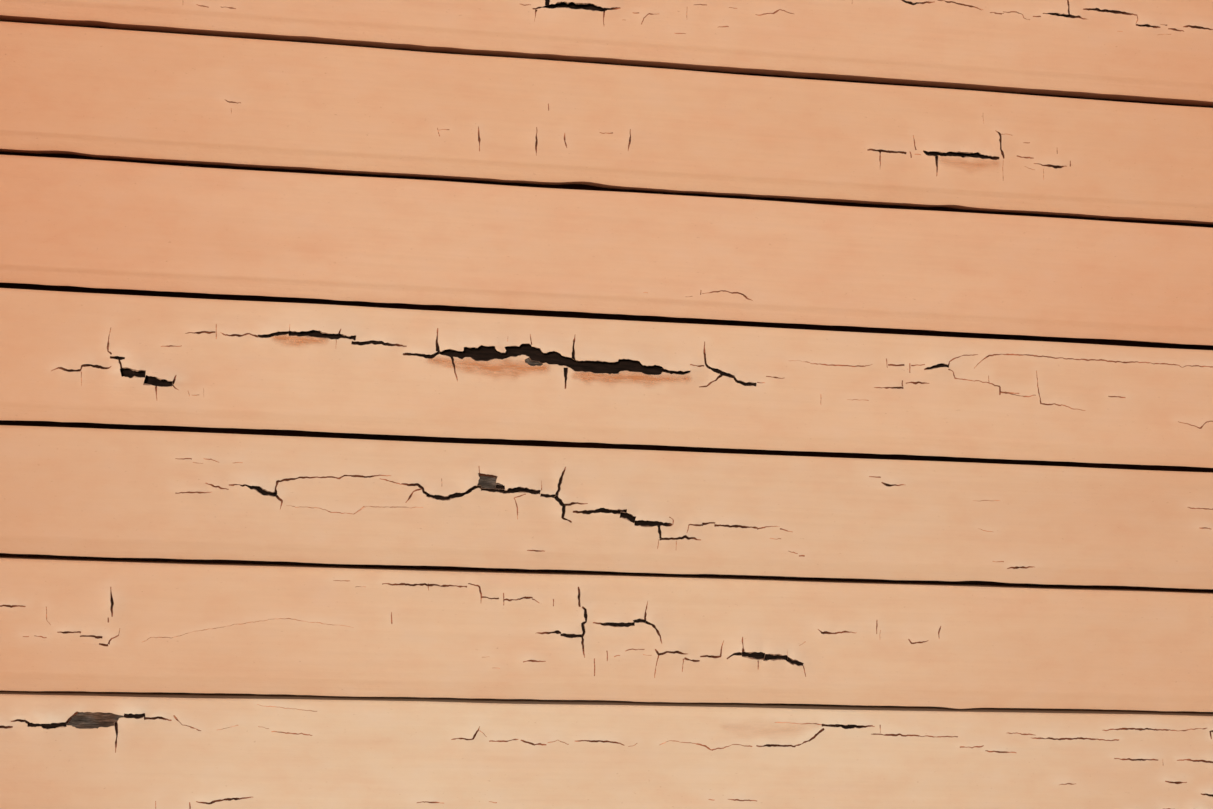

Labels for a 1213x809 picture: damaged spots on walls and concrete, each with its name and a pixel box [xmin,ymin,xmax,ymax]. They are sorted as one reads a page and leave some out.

peeling [521,0,621,25]
crack [901,0,1213,35]
crack [867,119,1071,180]
crack [51,324,929,404]
crack [175,458,283,509]
crack [401,467,805,557]
crack [0,587,354,647]
crack [333,580,941,678]
peeling [0,711,178,753]
crack [451,726,713,751]
crack [871,728,1213,809]